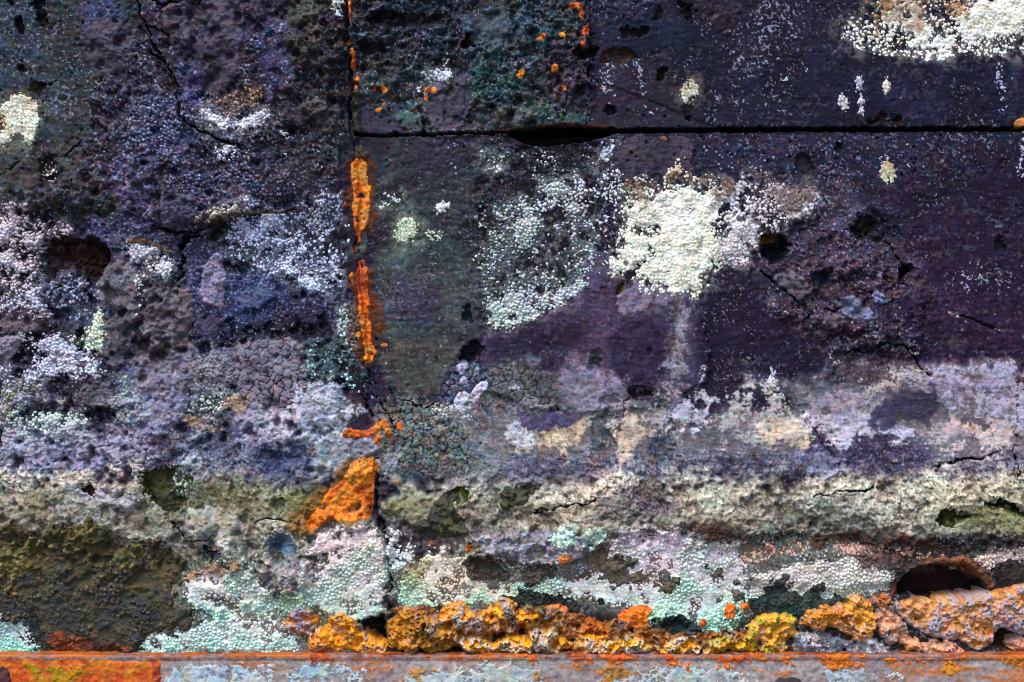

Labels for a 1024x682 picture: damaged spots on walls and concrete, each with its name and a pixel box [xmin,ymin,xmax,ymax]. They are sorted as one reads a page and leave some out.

rust [341,153,389,367]
crack [760,229,905,323]
crack [845,342,931,377]
rust [287,419,403,536]
crack [375,458,393,609]
crack [359,368,438,446]
crack [533,498,597,514]
rust [680,516,750,546]
crack [796,400,874,498]
crack [935,422,1021,484]
rust [284,522,1024,682]
rust [0,630,162,682]